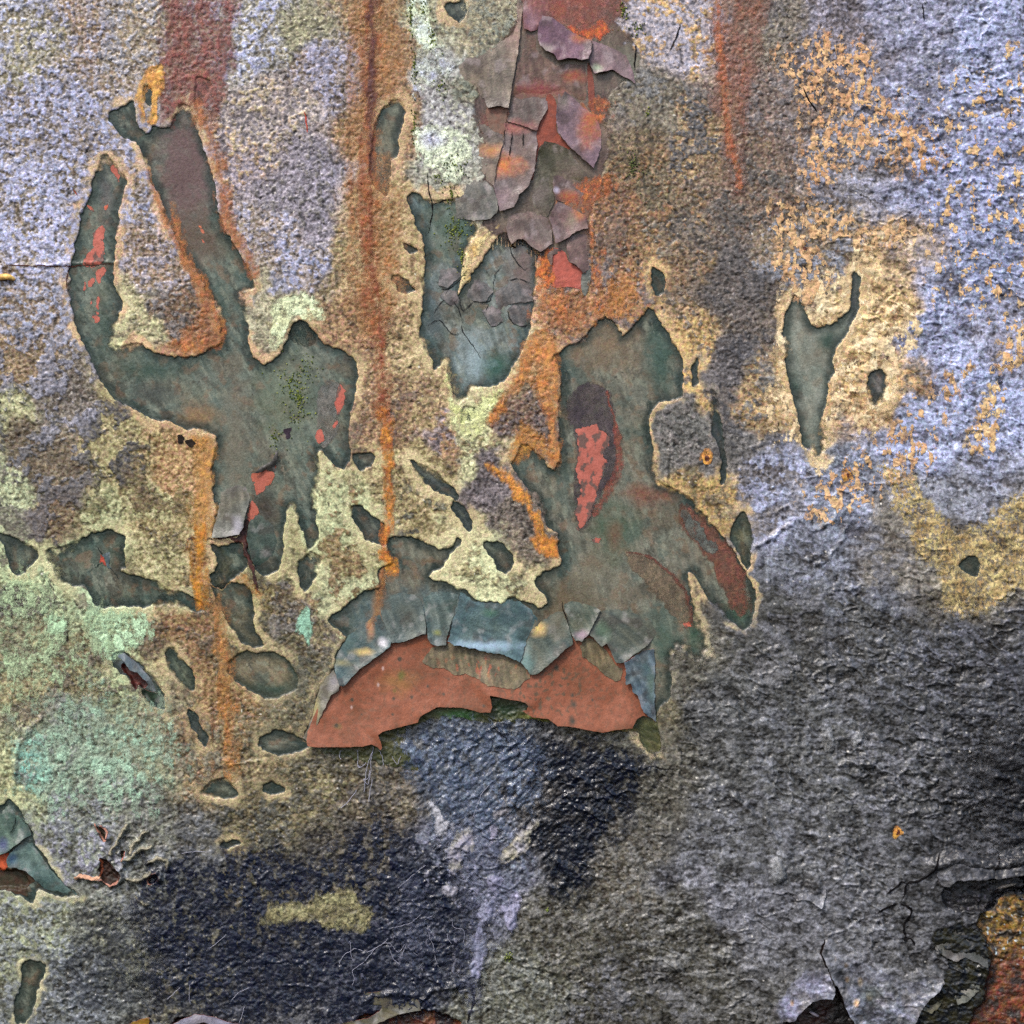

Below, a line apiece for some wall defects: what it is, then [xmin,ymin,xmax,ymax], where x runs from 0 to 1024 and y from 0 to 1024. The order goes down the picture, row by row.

peeling [0,79,375,699]
corrosion [135,0,259,278]
corrosion [345,0,403,601]
peeling [258,308,756,770]
peeling [391,0,641,423]
corrosion [485,464,558,557]
corrosion [488,226,635,467]
peeling [782,272,861,456]
water stain [69,716,658,1024]
crack [820,939,828,969]
peeling [769,851,1024,1024]
crack [879,851,942,945]